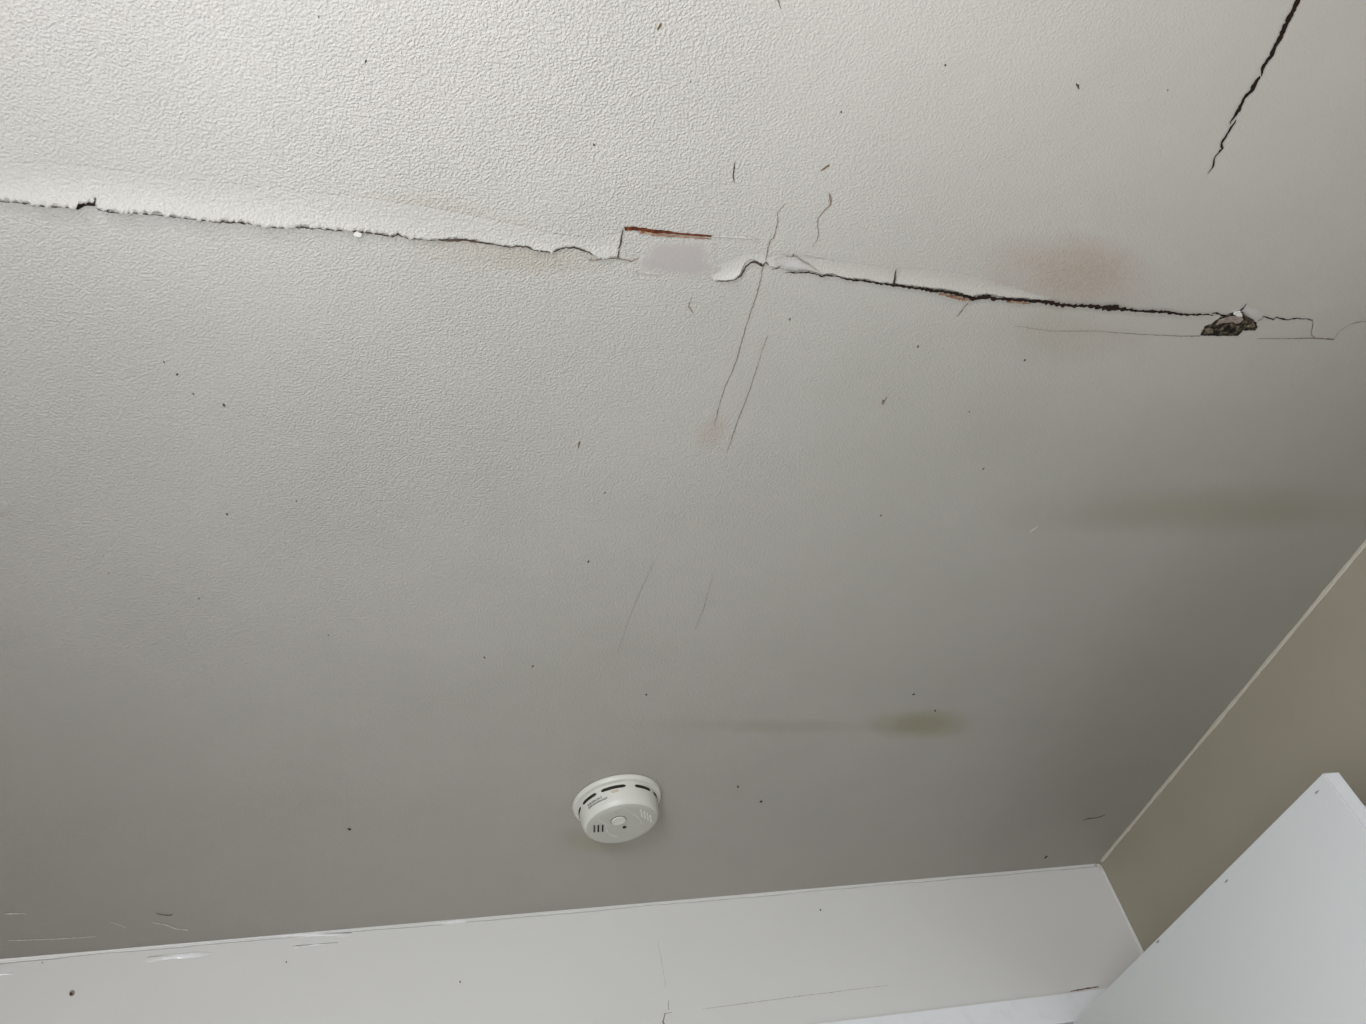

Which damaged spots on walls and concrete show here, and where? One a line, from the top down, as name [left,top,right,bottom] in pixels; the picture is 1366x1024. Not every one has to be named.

crack [1208,0,1300,173]
peeling [0,162,622,260]
crack [688,193,1213,451]